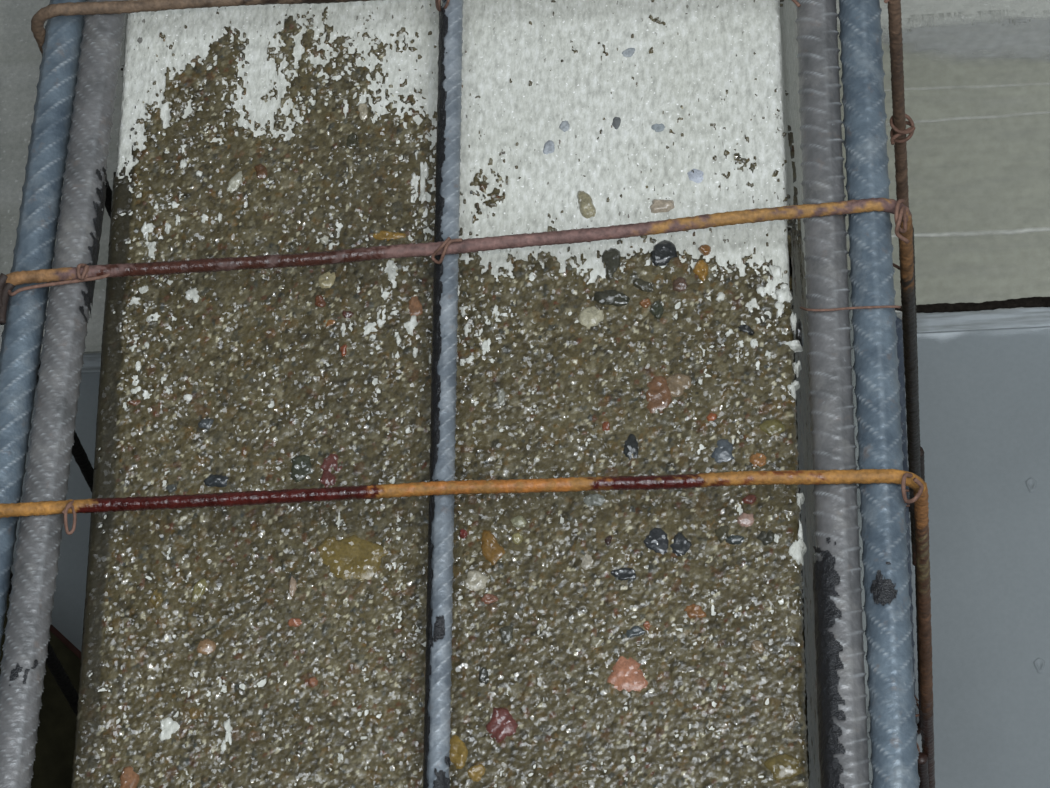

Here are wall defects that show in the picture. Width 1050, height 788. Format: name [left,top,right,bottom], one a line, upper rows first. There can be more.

spalling [0,0,909,504]
spalling [71,483,920,788]